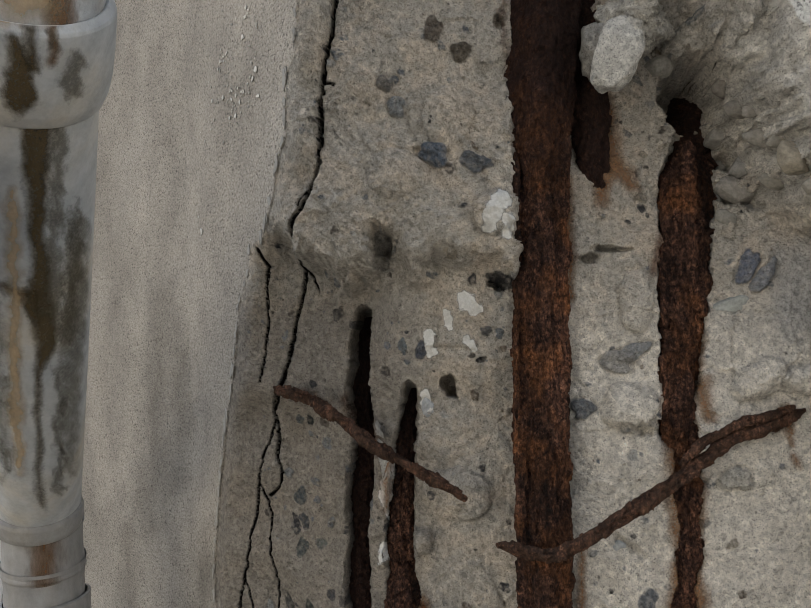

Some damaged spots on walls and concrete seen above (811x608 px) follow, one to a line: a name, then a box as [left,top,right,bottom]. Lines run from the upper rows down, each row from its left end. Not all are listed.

crack [315,0,339,167]
crack [240,186,320,608]
rust [343,317,376,440]
spalling [208,0,524,608]
rust [349,388,428,608]
rust [515,551,586,608]
rust [504,0,639,549]
rust [651,98,719,475]
rust [666,471,708,608]
spalling [568,0,811,608]
rust [785,424,801,468]